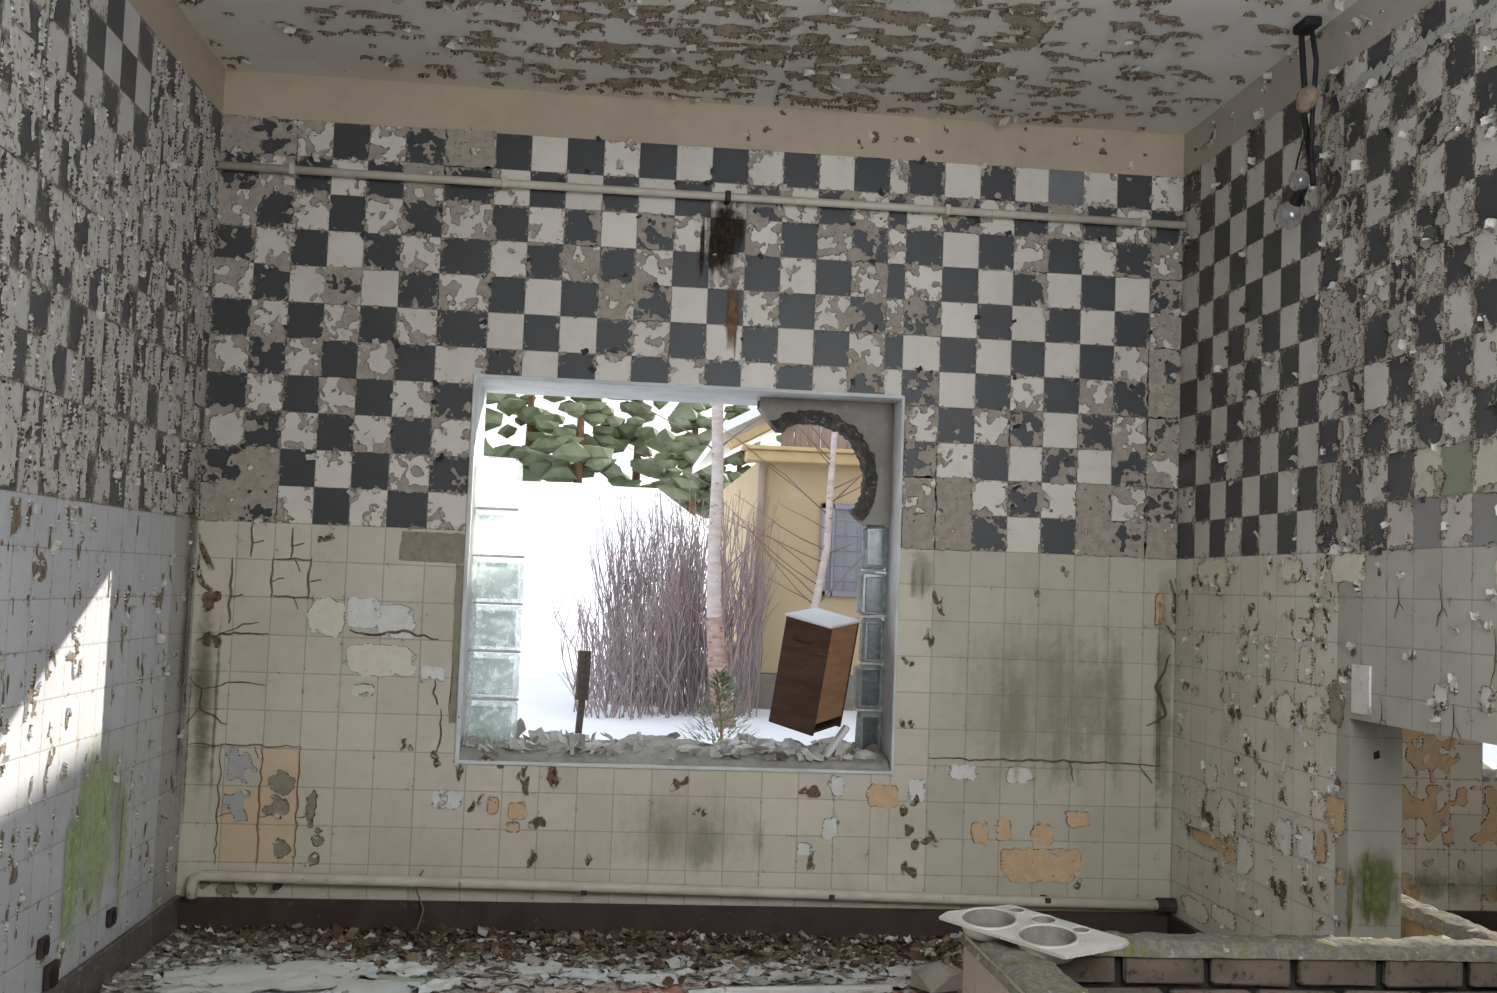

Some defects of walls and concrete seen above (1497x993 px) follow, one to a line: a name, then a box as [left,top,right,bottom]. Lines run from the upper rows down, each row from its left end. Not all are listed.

water stain [700,210,726,274]
peeling [0,0,545,761]
peeling [275,0,1497,931]
water stain [62,819,81,936]
peeling [200,881,258,897]